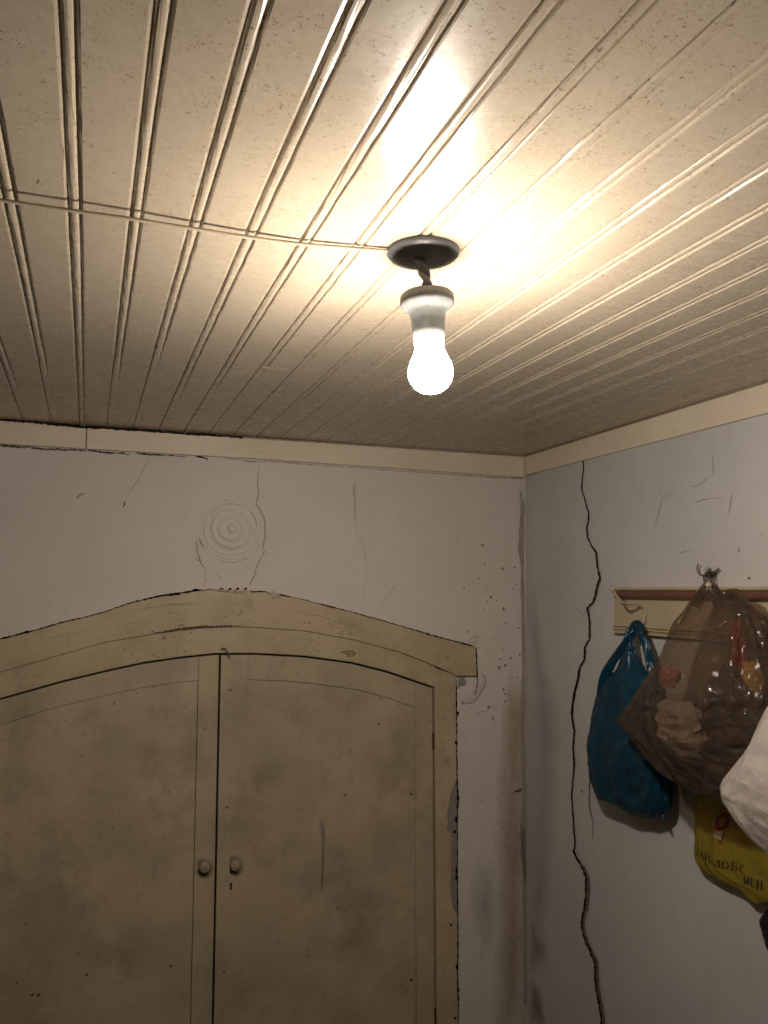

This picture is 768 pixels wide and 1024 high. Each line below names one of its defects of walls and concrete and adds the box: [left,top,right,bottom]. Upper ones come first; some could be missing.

crack [0,444,536,1024]
crack [564,461,605,1024]